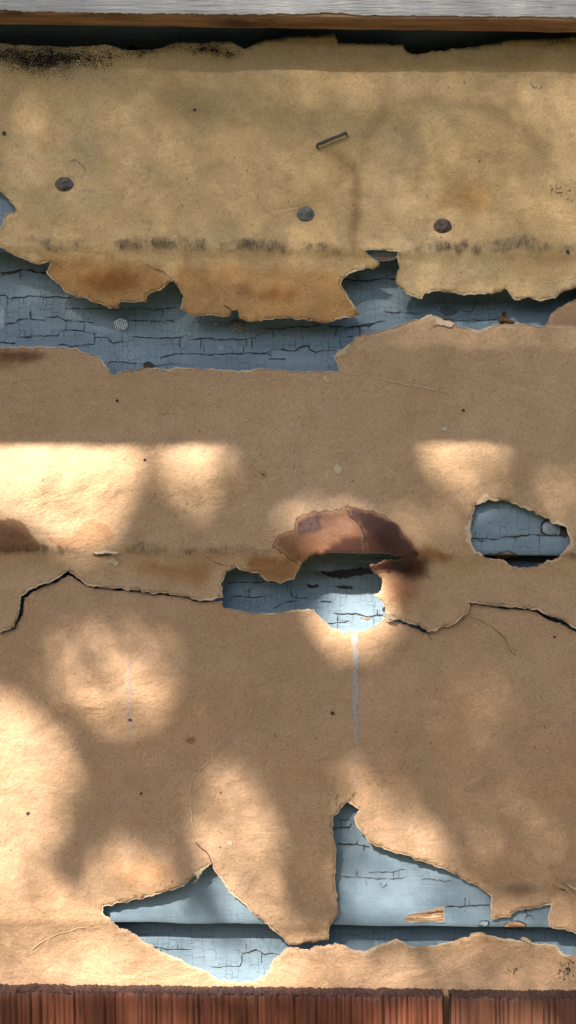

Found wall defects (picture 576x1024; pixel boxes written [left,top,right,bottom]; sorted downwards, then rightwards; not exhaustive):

peeling [368,252,398,261]
peeling [429,304,459,327]
crack [0,266,497,393]
peeling [484,550,518,561]
peeling [302,554,390,590]
leakage [351,633,359,740]
peeling [403,906,445,924]
peeling [503,920,531,944]